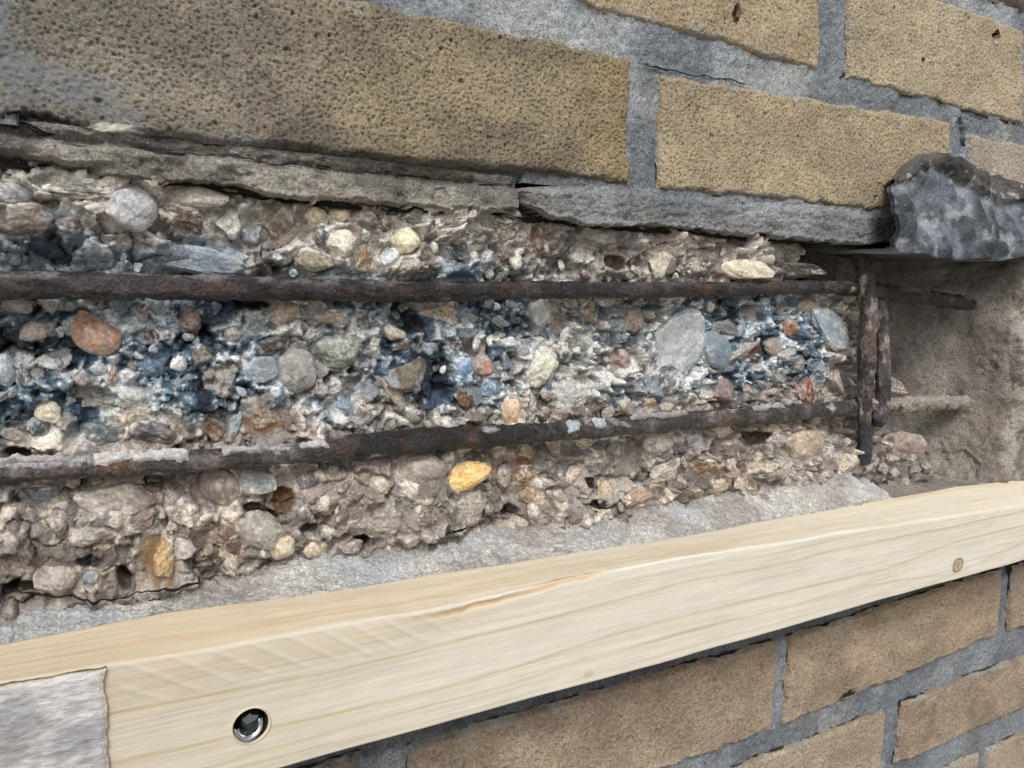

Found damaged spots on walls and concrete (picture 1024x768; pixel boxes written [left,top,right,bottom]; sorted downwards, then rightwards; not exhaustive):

crack [638,62,750,85]
crack [1,122,87,176]
crack [130,147,511,186]
crack [162,182,444,214]
crack [491,212,807,245]
spalling [0,159,977,622]